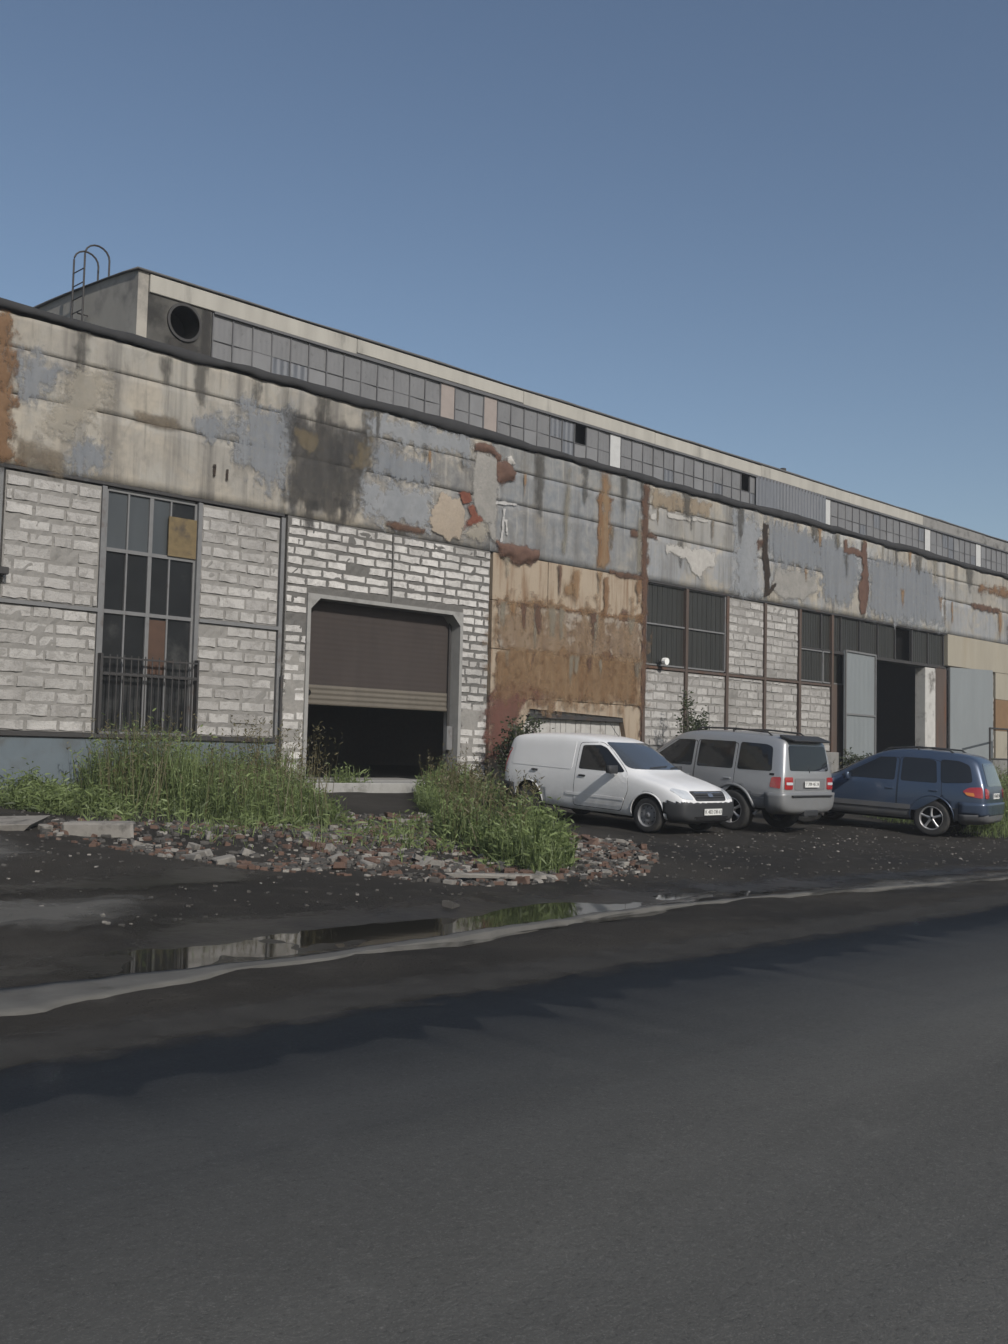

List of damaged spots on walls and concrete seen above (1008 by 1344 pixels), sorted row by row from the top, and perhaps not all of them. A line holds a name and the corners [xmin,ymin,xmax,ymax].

rust [0,311,24,466]
water stain [284,397,380,528]
peeling [360,412,500,543]
rust [844,540,869,614]
rust [971,584,1008,614]